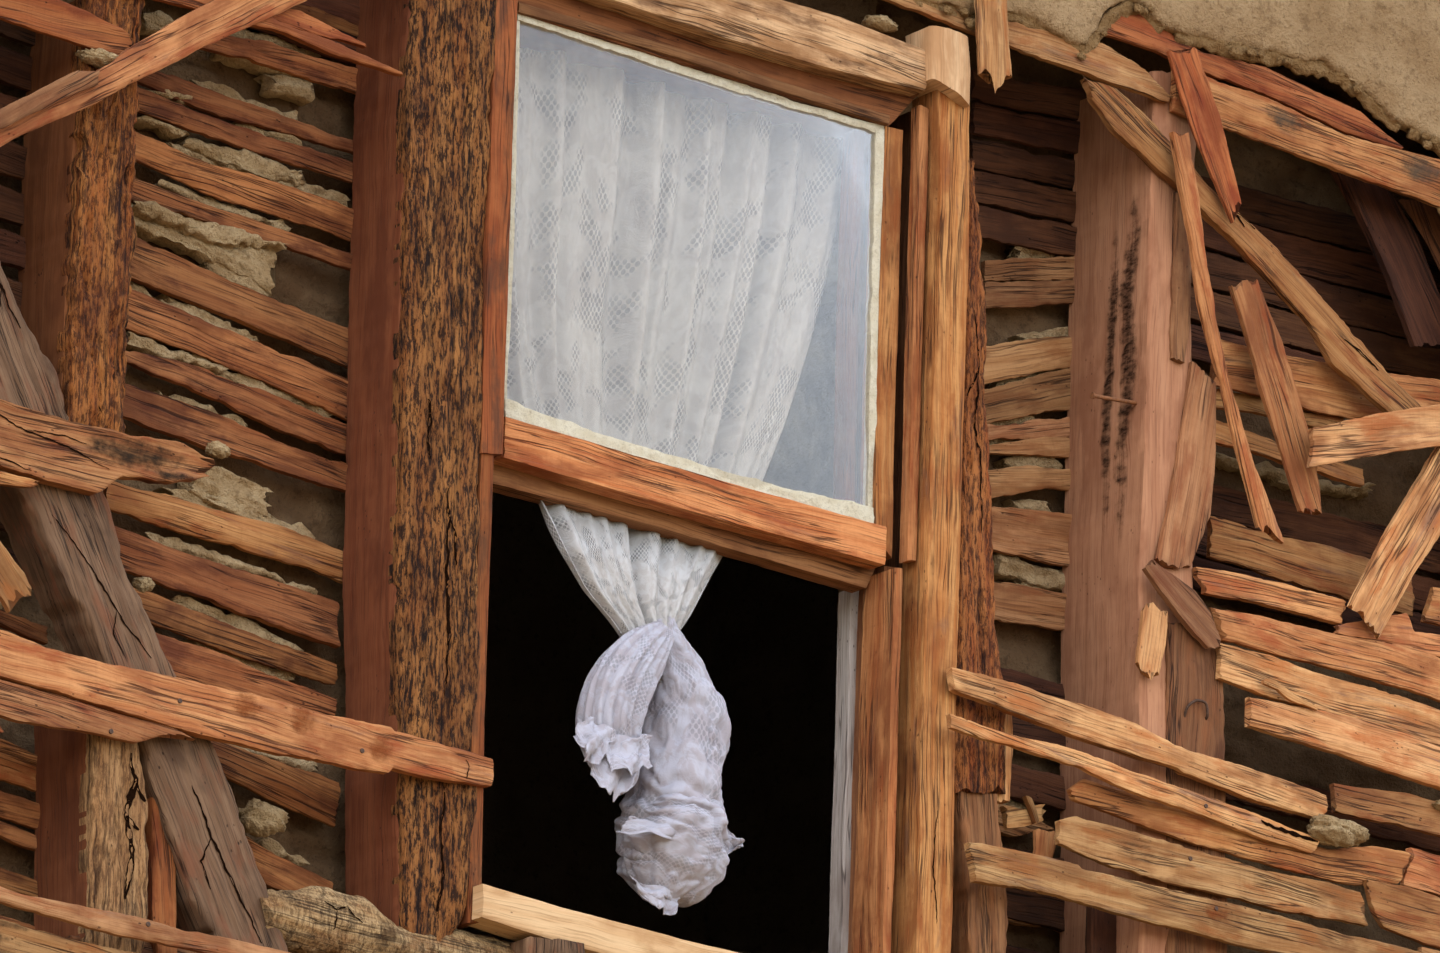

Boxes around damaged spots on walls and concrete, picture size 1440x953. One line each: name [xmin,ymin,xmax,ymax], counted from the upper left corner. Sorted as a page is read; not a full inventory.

spalling [914,0,976,30]
spalling [1007,1,1440,158]
crack [52,515,151,657]